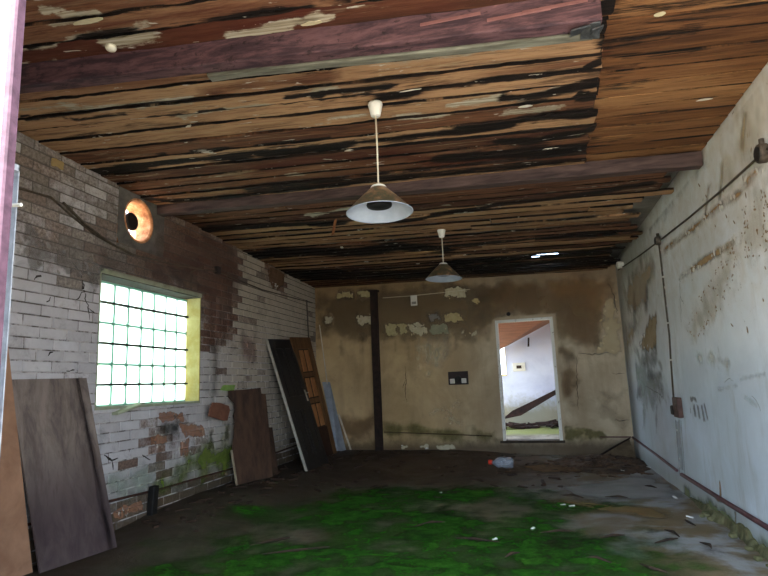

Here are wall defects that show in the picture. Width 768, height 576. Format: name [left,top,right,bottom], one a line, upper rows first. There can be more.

peeling [73,17,103,25]
peeling [660,168,768,337]
crack [72,262,95,322]
peeling [337,291,370,299]
peeling [445,286,480,304]
peeling [356,314,371,326]
peeling [385,313,477,336]
flaking render [638,314,657,352]
crack [576,284,659,429]
peeling [158,411,205,456]